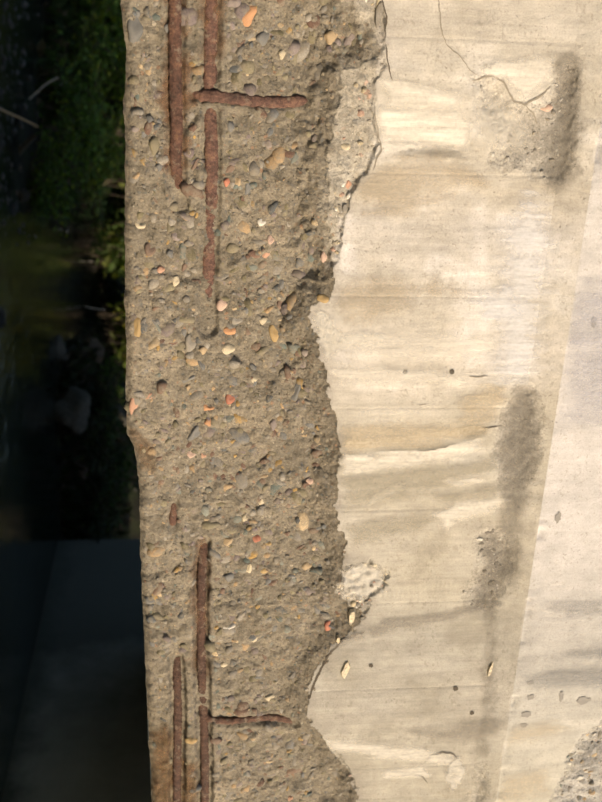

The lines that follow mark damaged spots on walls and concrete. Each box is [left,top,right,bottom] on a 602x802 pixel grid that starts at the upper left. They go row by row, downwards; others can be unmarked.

crack [438,0,550,125]
damp [484,62,546,96]
spalling [120,0,391,802]
spalling [549,720,602,802]